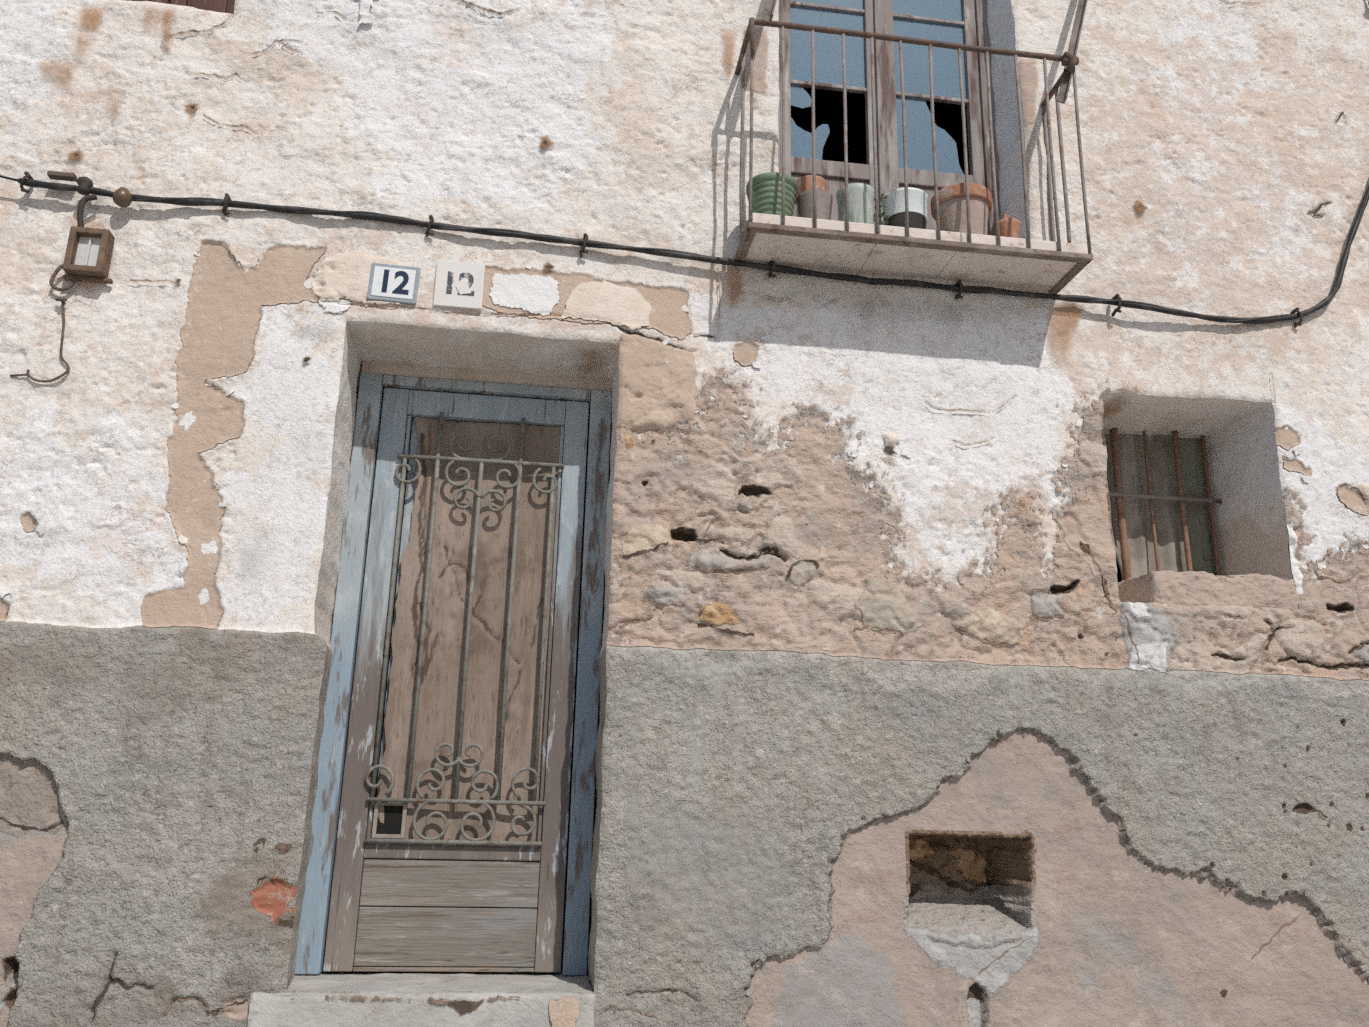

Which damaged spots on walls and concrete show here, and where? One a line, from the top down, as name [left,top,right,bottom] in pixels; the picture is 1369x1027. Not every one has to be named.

flaking render [141,239,417,629]
flaking render [456,265,693,346]
flaking render [606,340,1369,681]
flaking render [0,754,69,1027]
crack [90,955,231,1023]
flaking render [249,837,297,928]
flaking render [744,727,1369,1027]